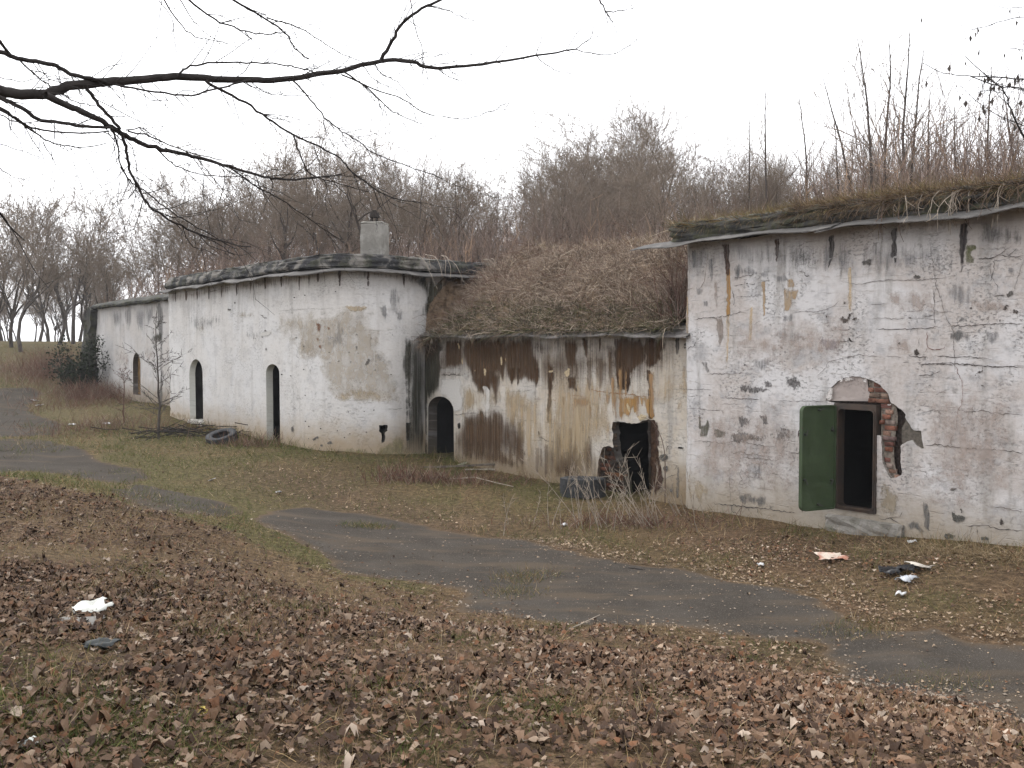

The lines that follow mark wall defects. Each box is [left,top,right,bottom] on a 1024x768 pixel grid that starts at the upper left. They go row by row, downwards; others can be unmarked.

damp [959,223,976,264]
damp [288,306,679,465]
damp [537,430,592,475]
rust [547,337,659,458]
flaking render [597,421,627,493]
flaking render [626,403,668,499]
crack [688,274,759,349]
crack [673,373,820,411]
flaking render [826,376,924,478]
crack [799,240,1024,453]